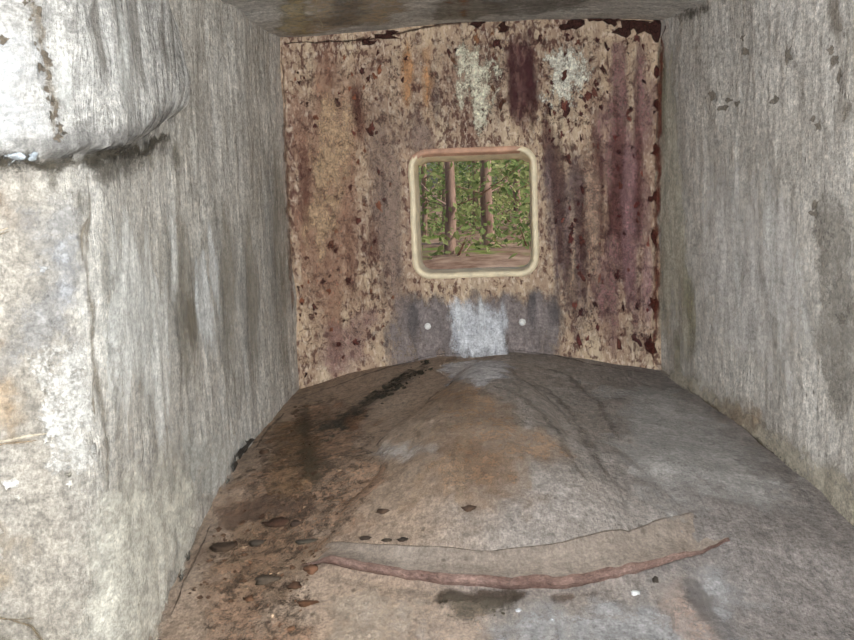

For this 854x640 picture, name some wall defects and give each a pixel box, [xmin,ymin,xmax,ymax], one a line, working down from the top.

corrosion [281,27,666,366]
water stain [441,301,588,481]
water stain [622,54,854,526]